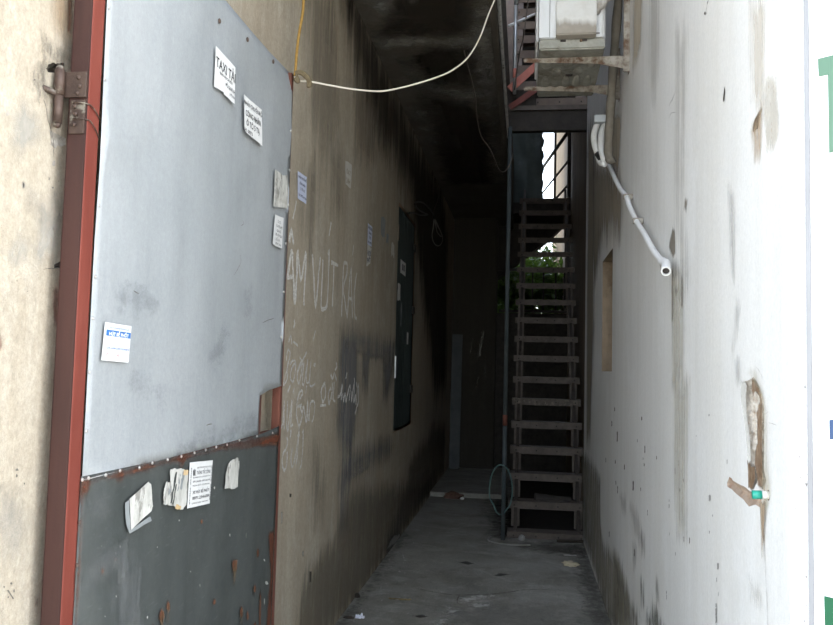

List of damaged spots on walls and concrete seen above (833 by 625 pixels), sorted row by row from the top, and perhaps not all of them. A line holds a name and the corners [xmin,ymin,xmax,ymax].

rust [240,532,274,625]
damp [300,331,444,625]
damp [527,454,634,625]
flaking render [741,377,766,490]